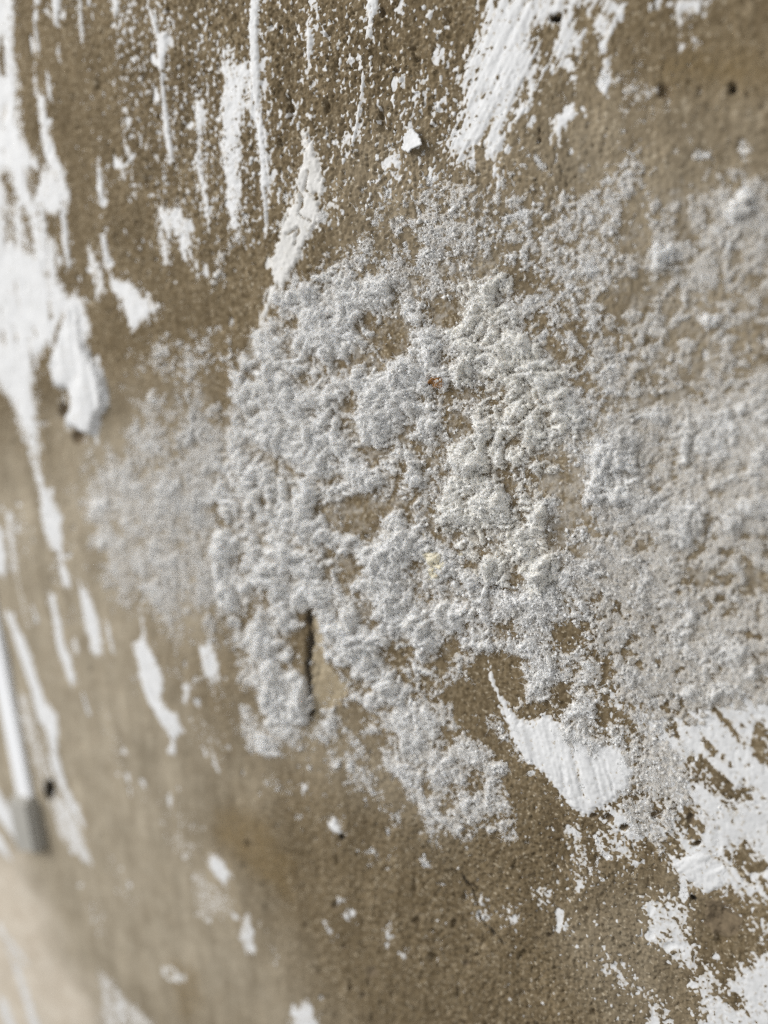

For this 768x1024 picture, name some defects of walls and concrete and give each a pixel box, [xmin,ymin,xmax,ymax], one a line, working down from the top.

peeling [108,0,375,347]
peeling [379,0,628,190]
spalling [656,83,672,101]
peeling [649,0,711,53]
peeling [0,0,167,869]
damp [36,34,768,888]
peeling [590,672,768,1024]